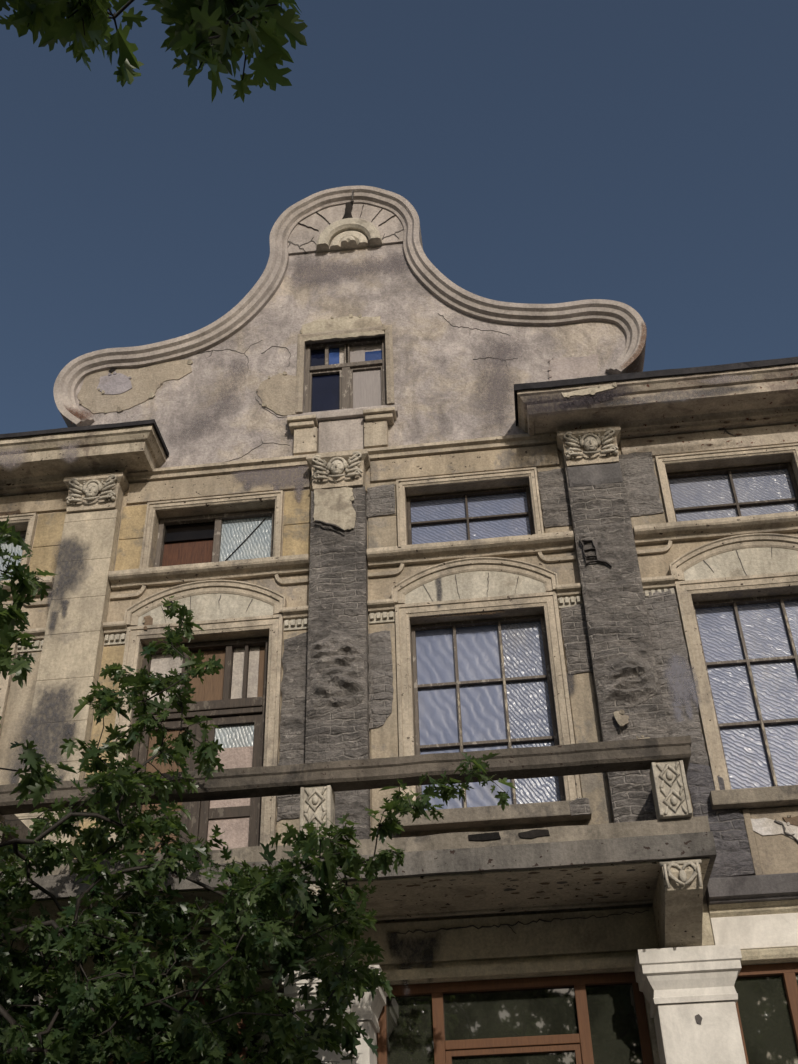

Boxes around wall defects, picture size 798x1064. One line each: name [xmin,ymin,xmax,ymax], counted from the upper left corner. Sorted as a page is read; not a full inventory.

crack [197,340,291,372]
crack [438,313,516,368]
crack [225,396,290,462]
flaking render [278,484,396,766]
flaking render [538,452,798,878]
flaking render [277,794,300,822]
flaking render [334,789,368,840]
crack [391,910,649,934]